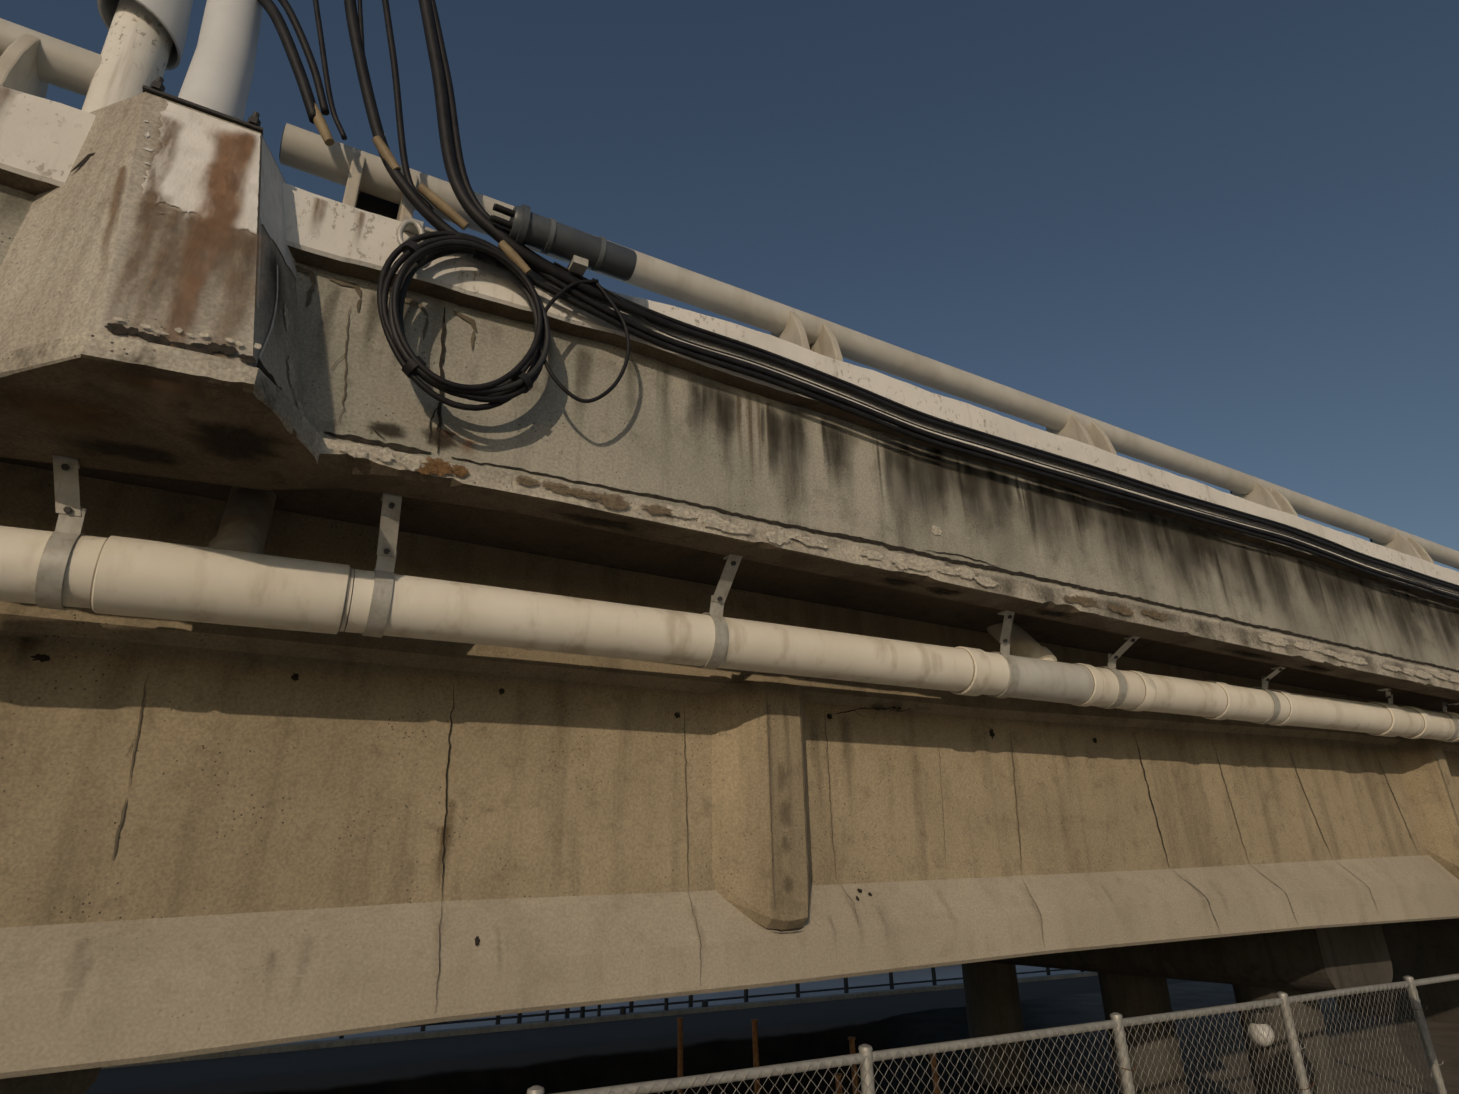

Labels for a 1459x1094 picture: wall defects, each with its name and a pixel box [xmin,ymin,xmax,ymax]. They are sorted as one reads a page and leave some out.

corrosion [160,121,177,150]
corrosion [106,166,124,234]
corrosion [132,134,253,321]
leakage [709,389,796,450]
spalling [516,475,829,548]
leakage [897,447,1088,514]
spalling [861,549,999,587]
spalling [1063,595,1171,621]
spalling [1258,634,1459,683]
crack [111,672,149,861]
crack [434,685,454,1014]
crack [1134,735,1221,934]